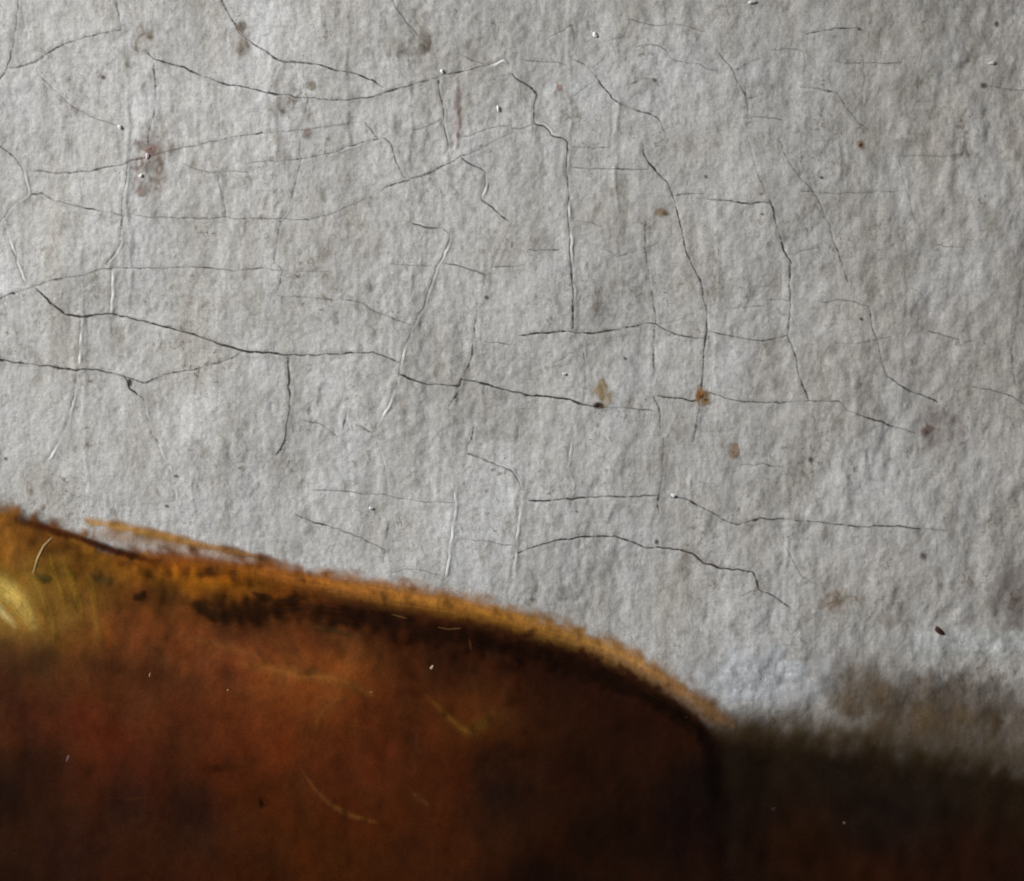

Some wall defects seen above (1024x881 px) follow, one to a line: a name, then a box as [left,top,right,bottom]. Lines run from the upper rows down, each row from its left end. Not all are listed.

crack [0,0,809,492]
crack [445,493,457,576]
crack [467,426,935,606]